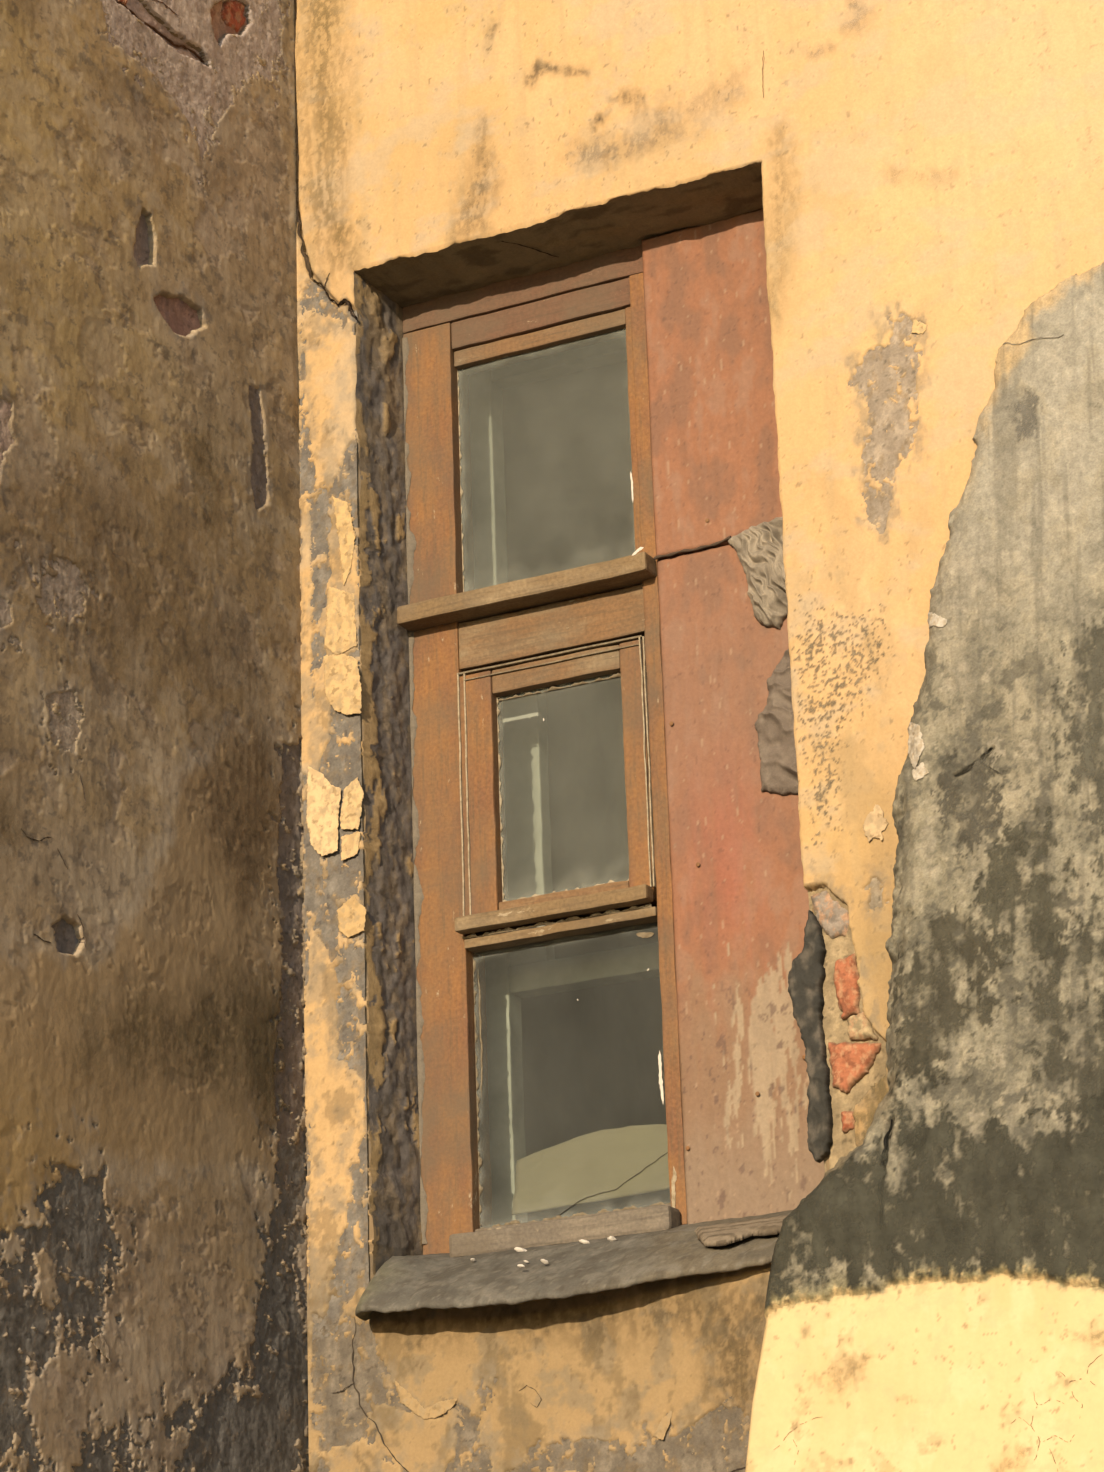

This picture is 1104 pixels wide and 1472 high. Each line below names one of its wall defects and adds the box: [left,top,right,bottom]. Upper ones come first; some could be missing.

crack [117,0,204,63]
peeling [98,0,294,183]
crack [279,0,358,321]
peeling [848,312,928,534]
peeling [0,281,751,1472]
peeling [863,804,888,842]
peeling [864,877,889,912]
spalling [808,886,887,1172]